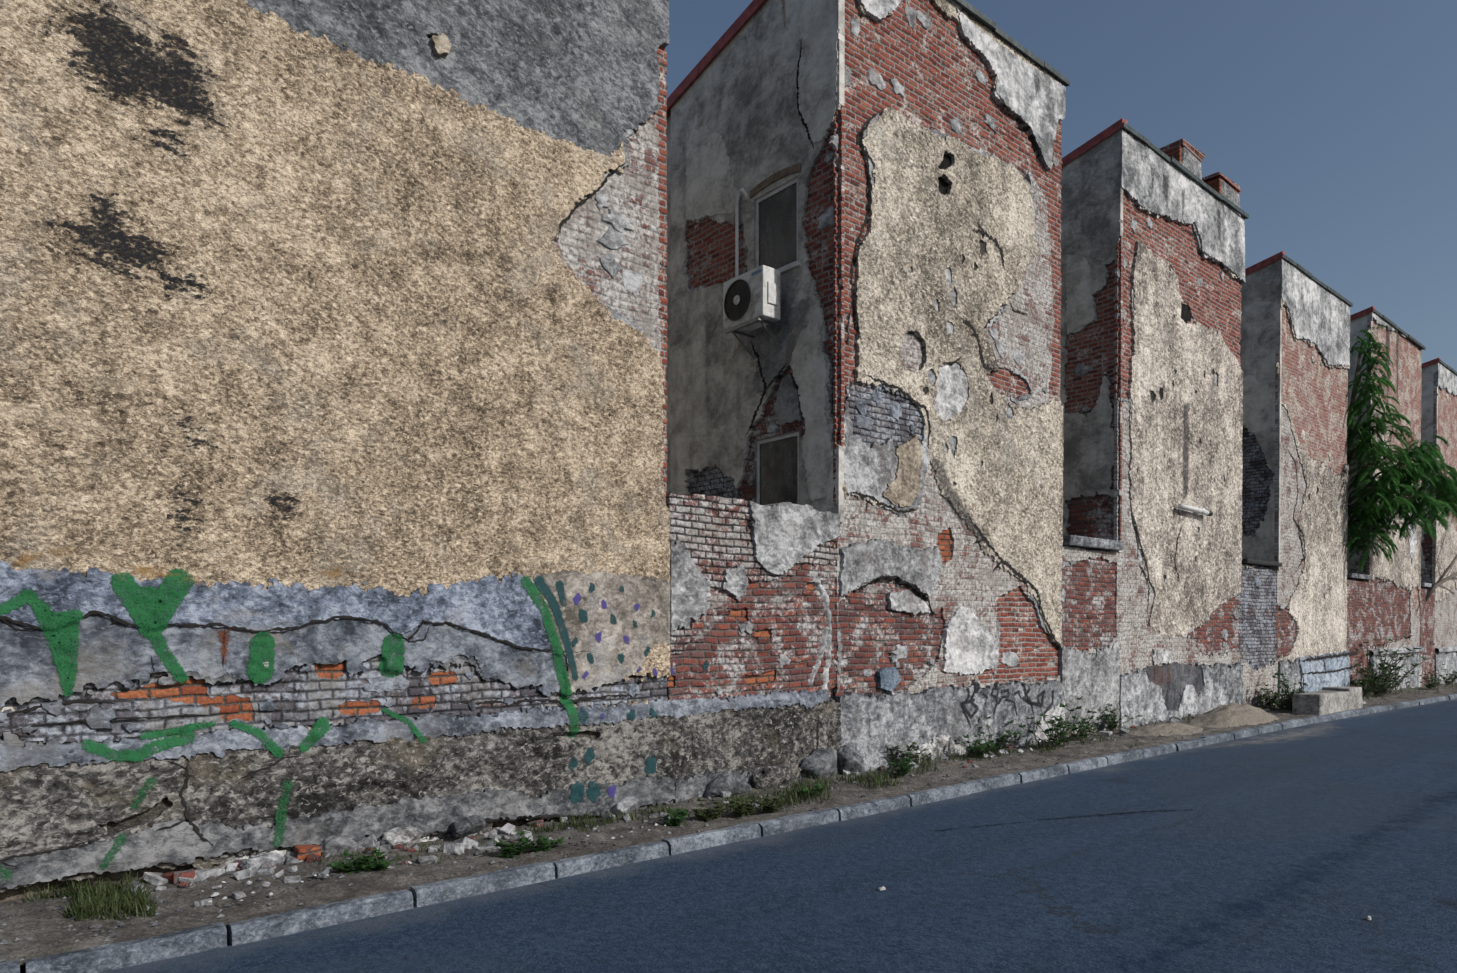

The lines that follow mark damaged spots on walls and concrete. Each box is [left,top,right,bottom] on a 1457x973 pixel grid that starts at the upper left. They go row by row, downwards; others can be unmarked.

leakage [33,0,237,160]
leakage [44,176,222,306]
spalling [553,46,748,505]
spalling [686,0,1348,711]
spalling [1367,320,1457,532]
crack [0,700,218,733]
crack [0,610,594,670]
spalling [0,562,944,744]
crack [454,694,644,705]
crack [971,522,1062,650]
spalling [1349,509,1437,647]
crack [156,761,213,846]